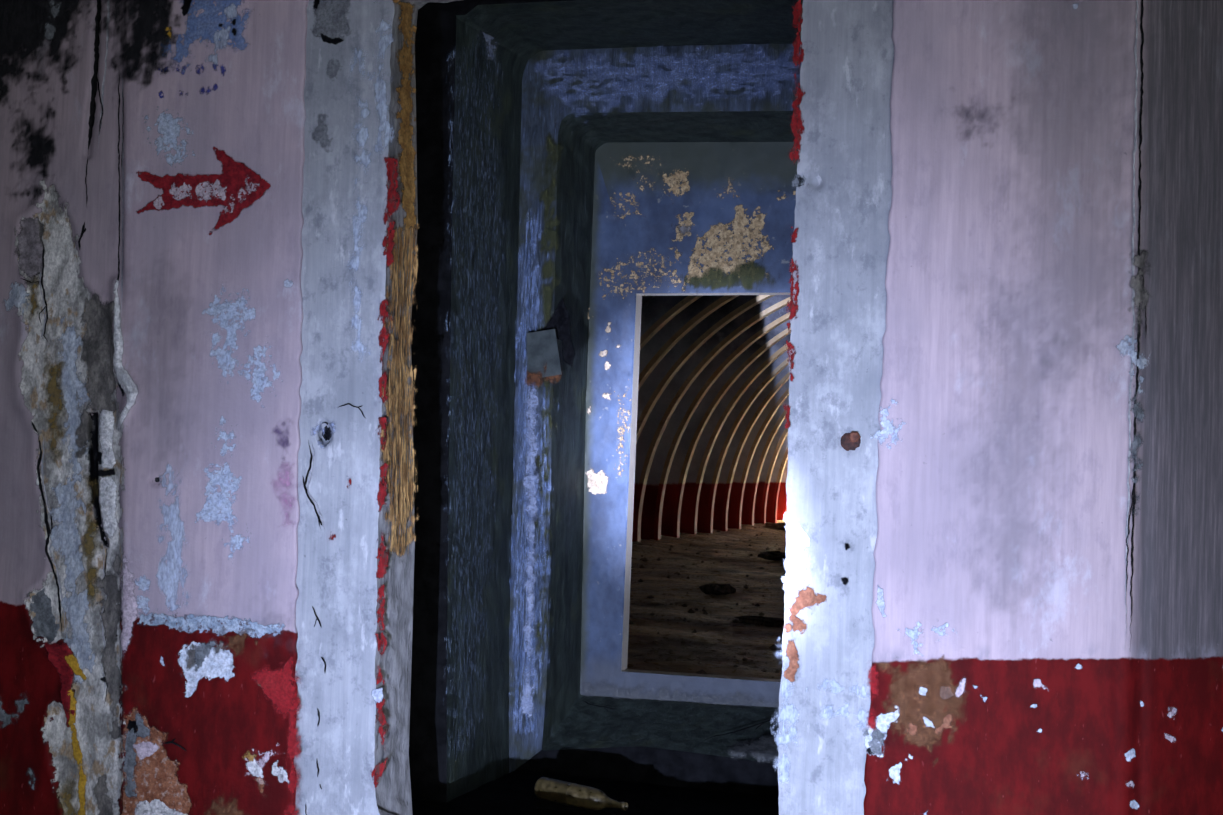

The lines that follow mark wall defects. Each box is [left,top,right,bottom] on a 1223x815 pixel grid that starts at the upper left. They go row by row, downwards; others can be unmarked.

peeling [165,0,249,73]
peeling [610,155,690,219]
peeling [599,180,774,300]
spalling [529,299,575,367]
peeling [870,399,905,449]
crack [32,422,65,635]
flaking render [0,177,289,815]
crack [303,441,325,531]
peeling [250,658,300,718]
peeling [863,621,987,784]